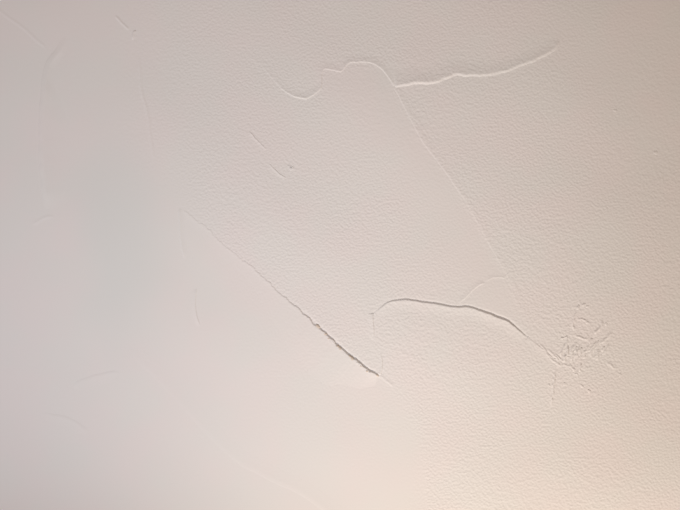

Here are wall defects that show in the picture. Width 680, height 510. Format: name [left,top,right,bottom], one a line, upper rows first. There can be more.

crack [393,39,561,88]
crack [182,209,553,389]